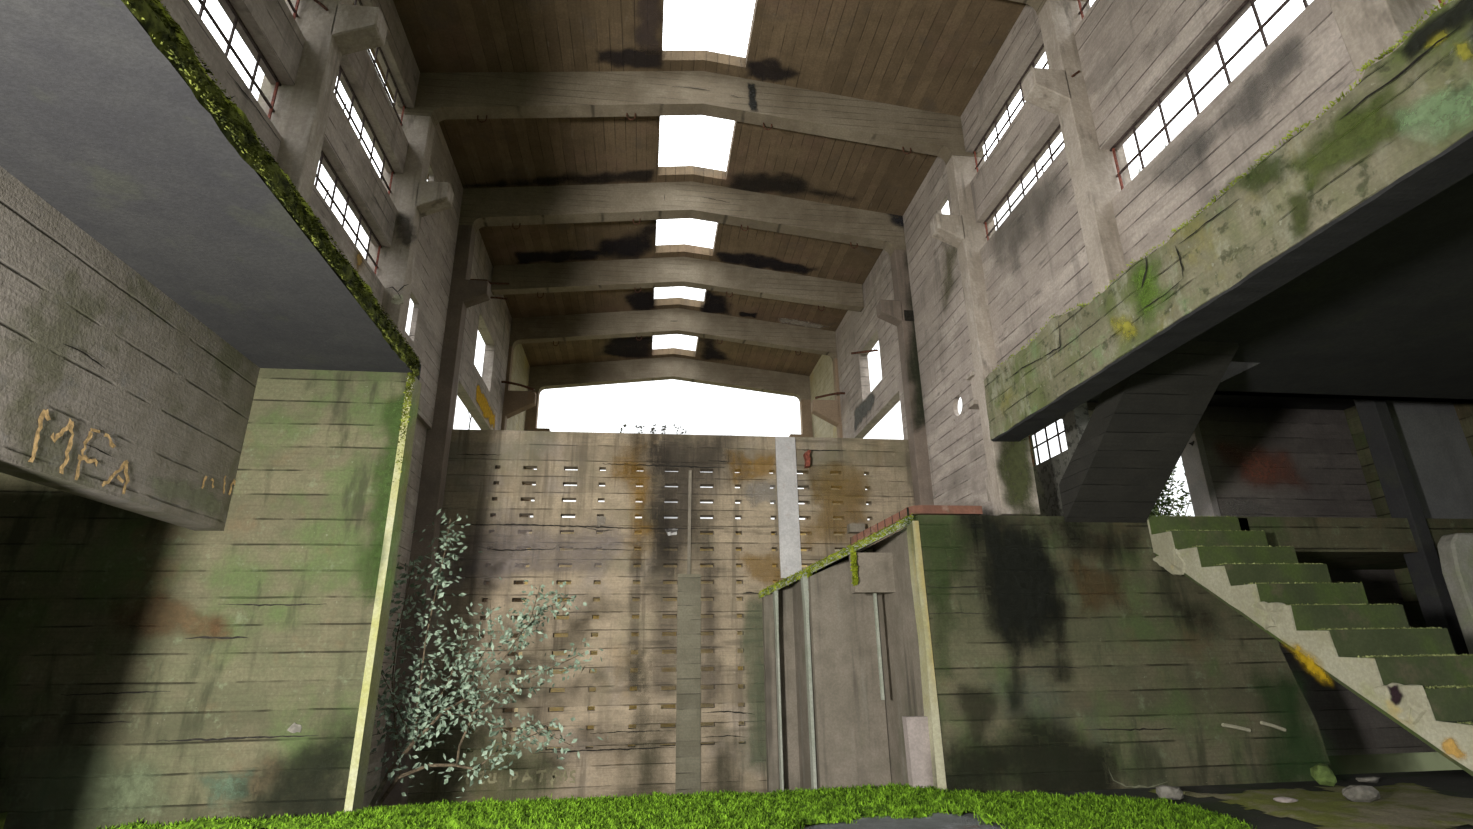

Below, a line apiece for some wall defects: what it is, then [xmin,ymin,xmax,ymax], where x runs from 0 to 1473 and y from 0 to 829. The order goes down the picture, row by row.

crack [64,344,104,368]
leakage [637,428,726,555]
leakage [961,508,1063,648]